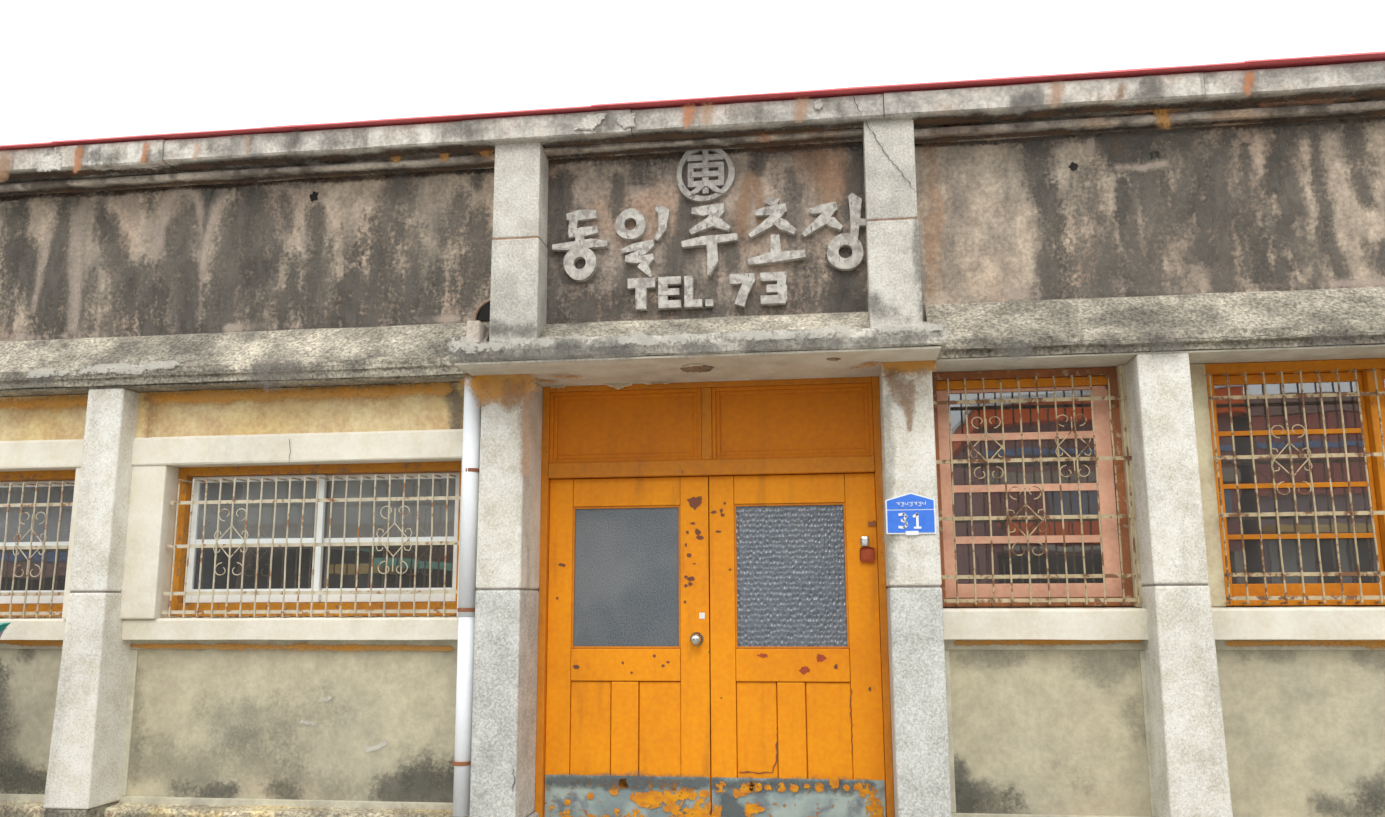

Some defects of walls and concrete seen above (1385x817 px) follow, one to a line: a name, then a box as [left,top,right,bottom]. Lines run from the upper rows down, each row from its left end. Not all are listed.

damp [0,163,495,341]
damp [546,137,896,348]
crack [852,95,919,197]
damp [914,111,1385,301]
peeling [684,496,726,604]
damp [1316,780,1385,817]